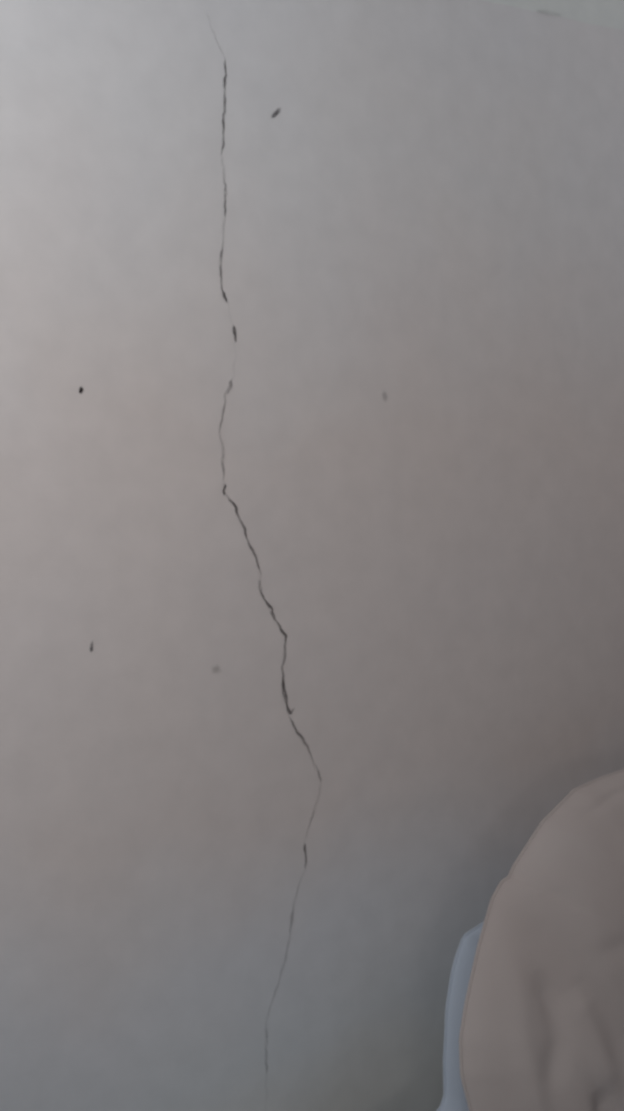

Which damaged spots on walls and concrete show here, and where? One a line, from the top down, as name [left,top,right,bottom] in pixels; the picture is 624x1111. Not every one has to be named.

crack [220,64,228,148]
crack [223,485,309,750]